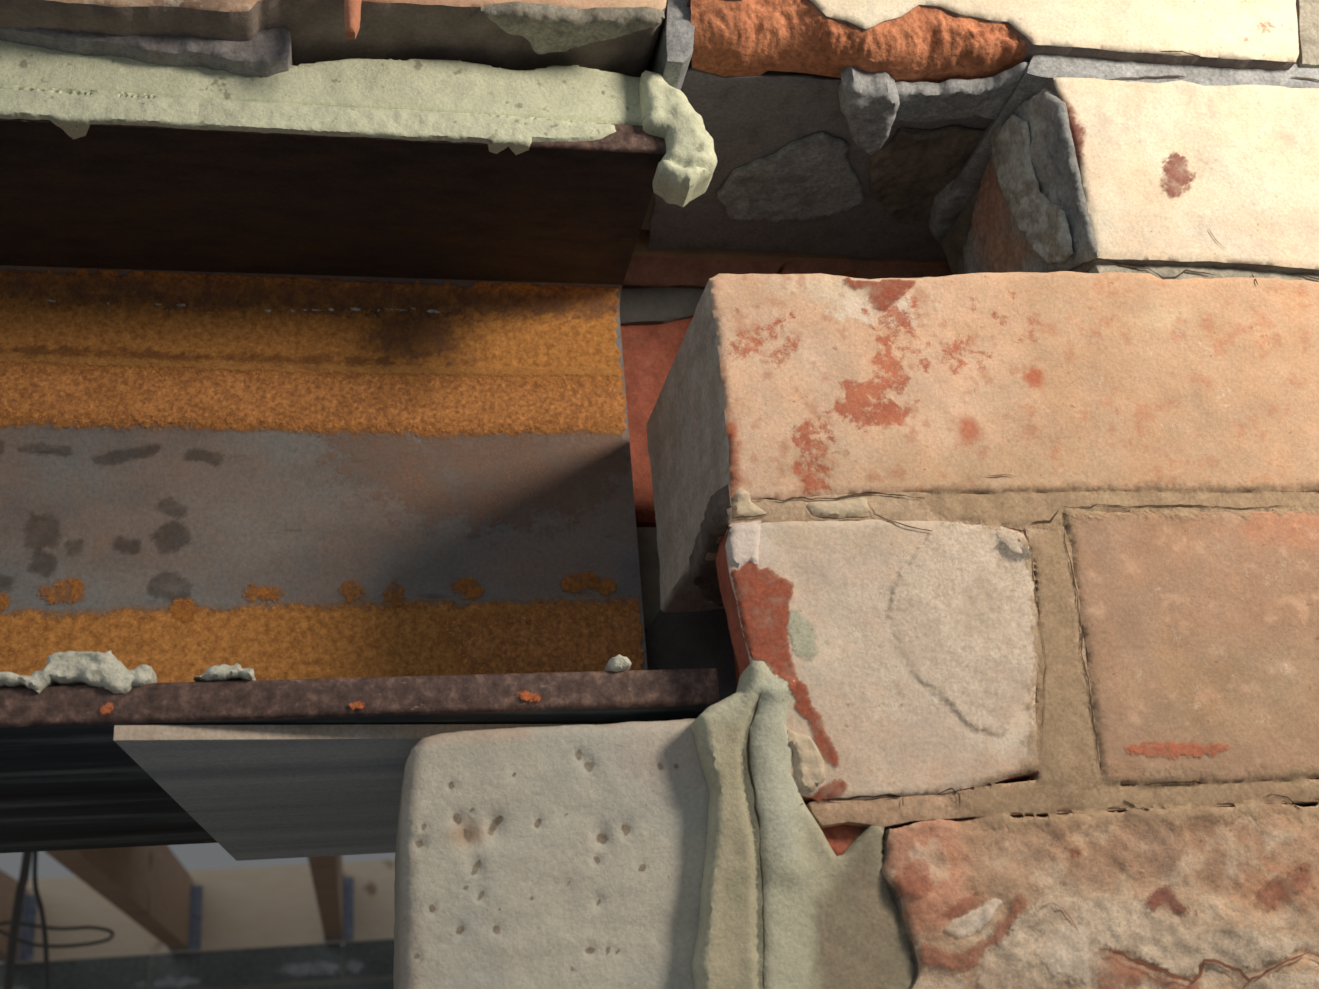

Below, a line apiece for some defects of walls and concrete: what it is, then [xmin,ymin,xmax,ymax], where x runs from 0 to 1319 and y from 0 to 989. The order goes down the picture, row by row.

spalling [691,0,1026,83]
rust [0,268,627,437]
rust [0,571,644,683]
leakage [820,841,911,989]
peeling [921,885,1319,989]
crack [1031,899,1319,989]